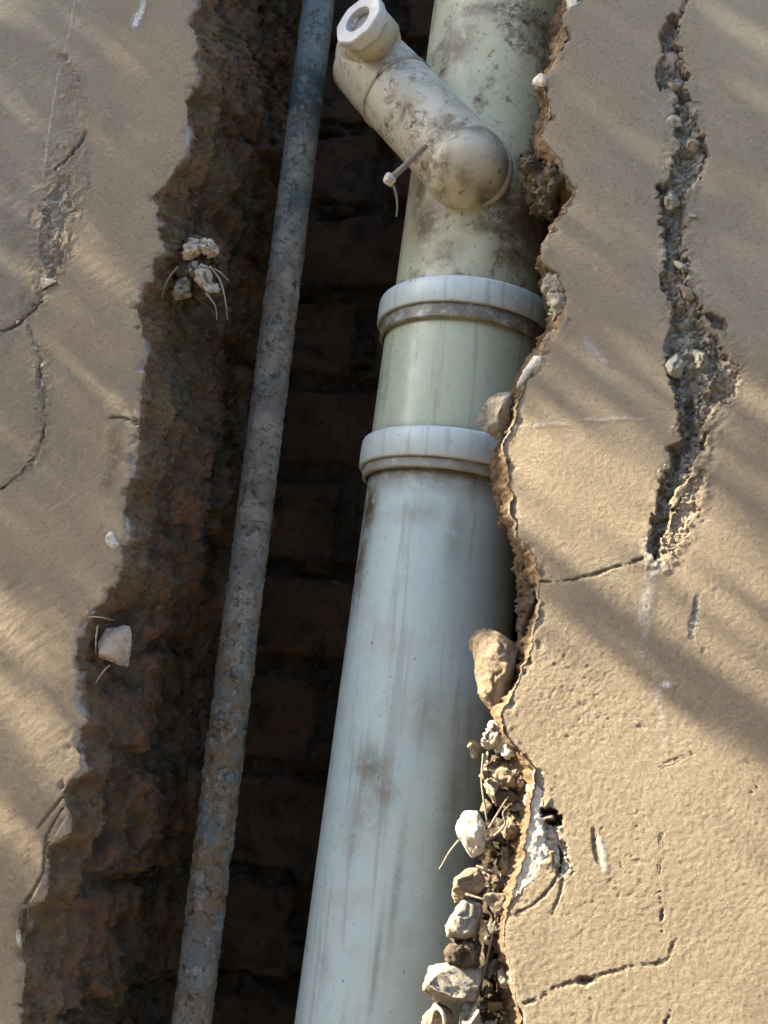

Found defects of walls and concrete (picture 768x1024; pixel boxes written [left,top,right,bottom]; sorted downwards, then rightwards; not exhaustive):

crack [0,129,91,491]
spalling [16,0,228,1024]
spalling [480,0,581,1024]
crack [540,0,739,583]
crack [524,833,678,1005]